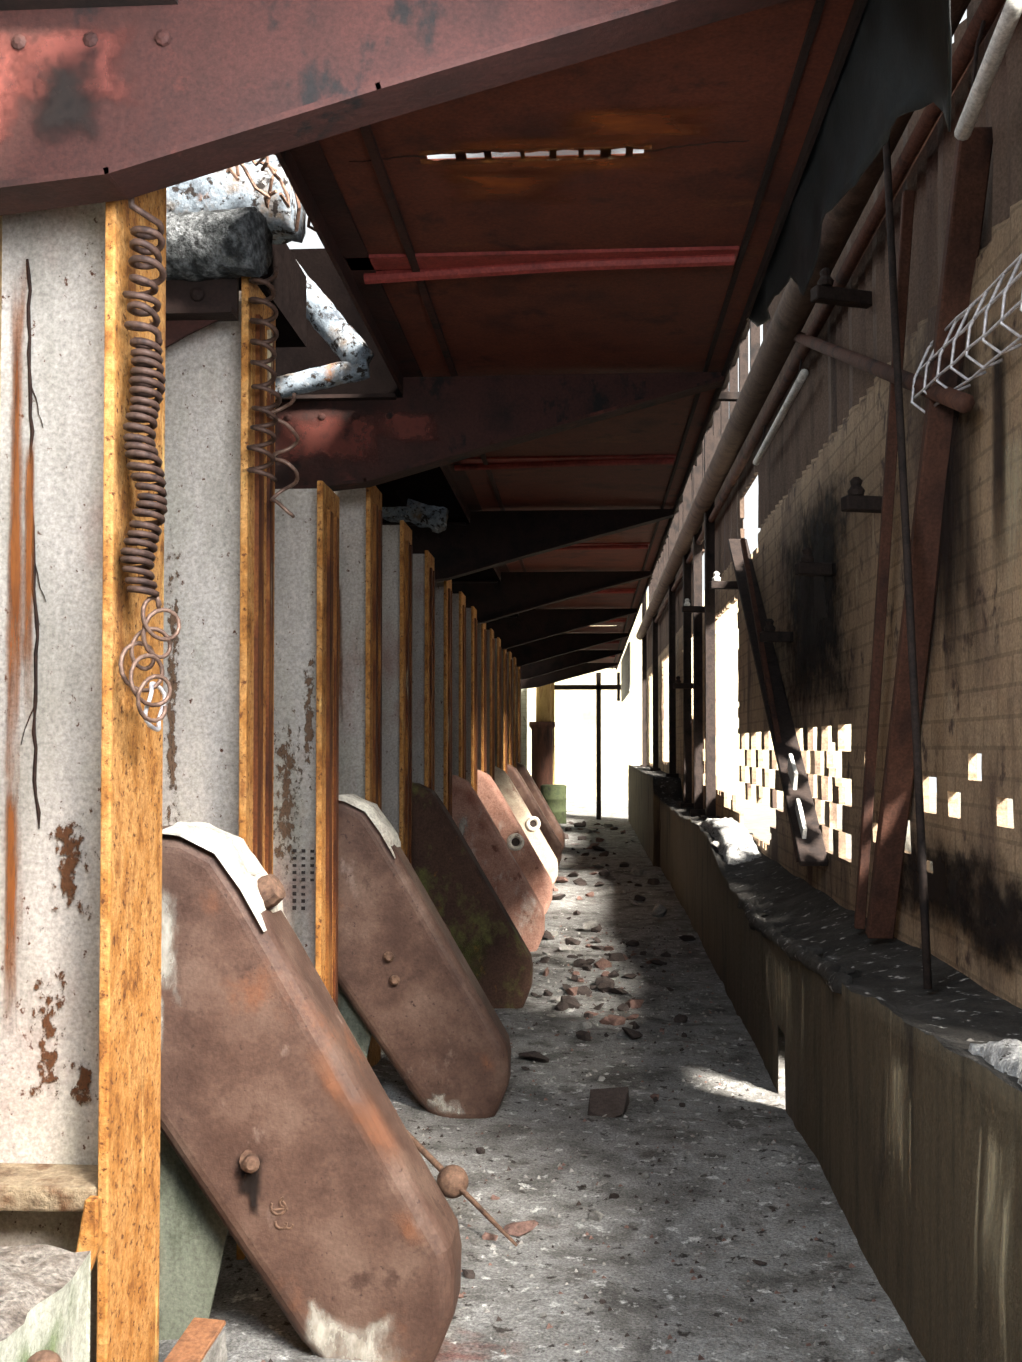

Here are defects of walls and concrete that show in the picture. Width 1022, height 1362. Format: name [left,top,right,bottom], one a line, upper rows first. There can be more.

crack [26,259,43,455]
corrosion [8,305,34,751]
crack [21,518,46,828]
corrosion [5,799,16,991]
corrosion [47,808,100,920]
corrosion [28,971,98,1107]